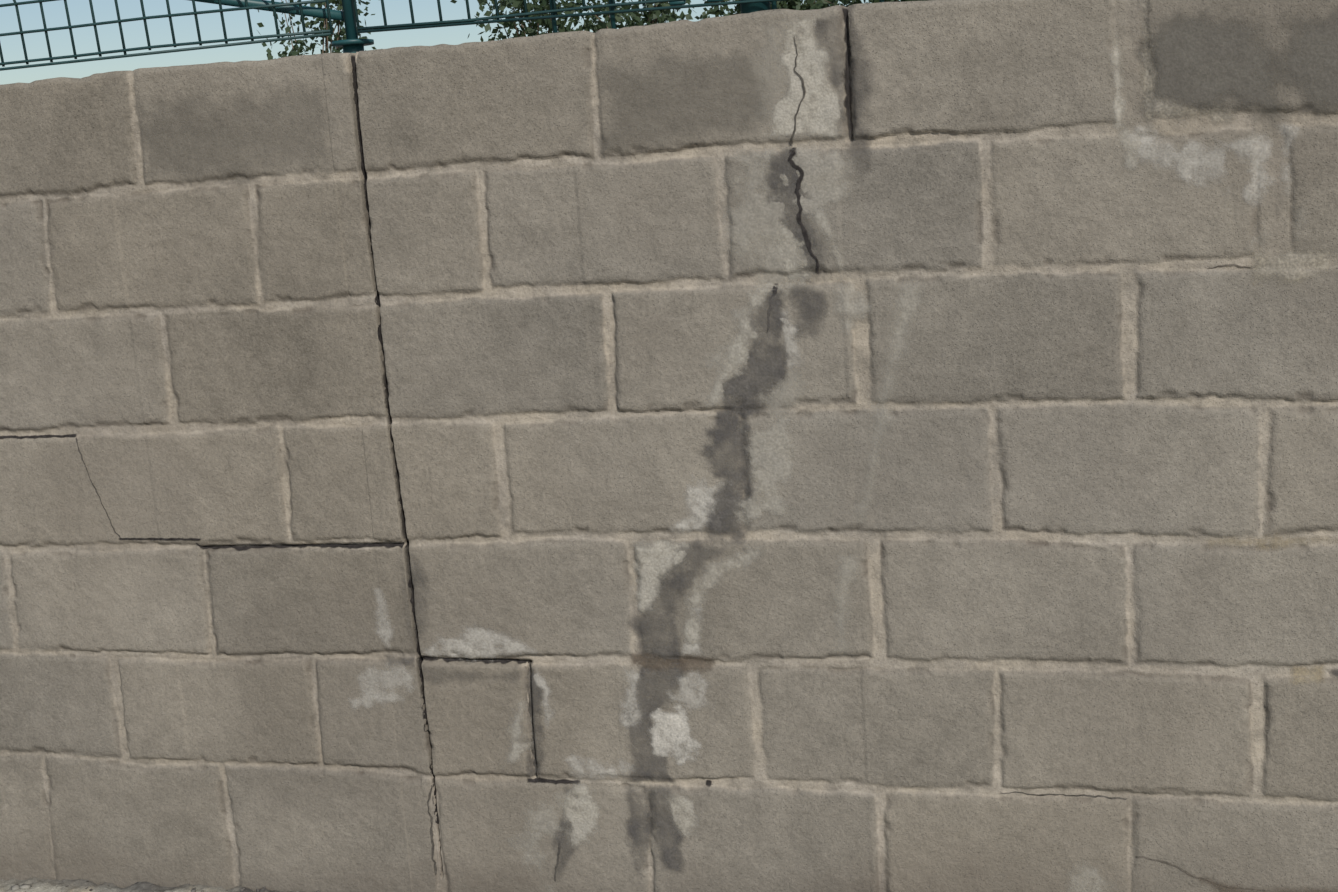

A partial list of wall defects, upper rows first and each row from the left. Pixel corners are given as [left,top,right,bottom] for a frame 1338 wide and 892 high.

crack [843,8,853,140]
water stain [1141,16,1278,112]
crack [351,56,373,255]
water stain [770,151,815,255]
crack [788,36,819,273]
water stain [1121,128,1269,200]
crack [0,290,580,881]
water stain [621,289,825,871]
crack [1136,856,1265,892]